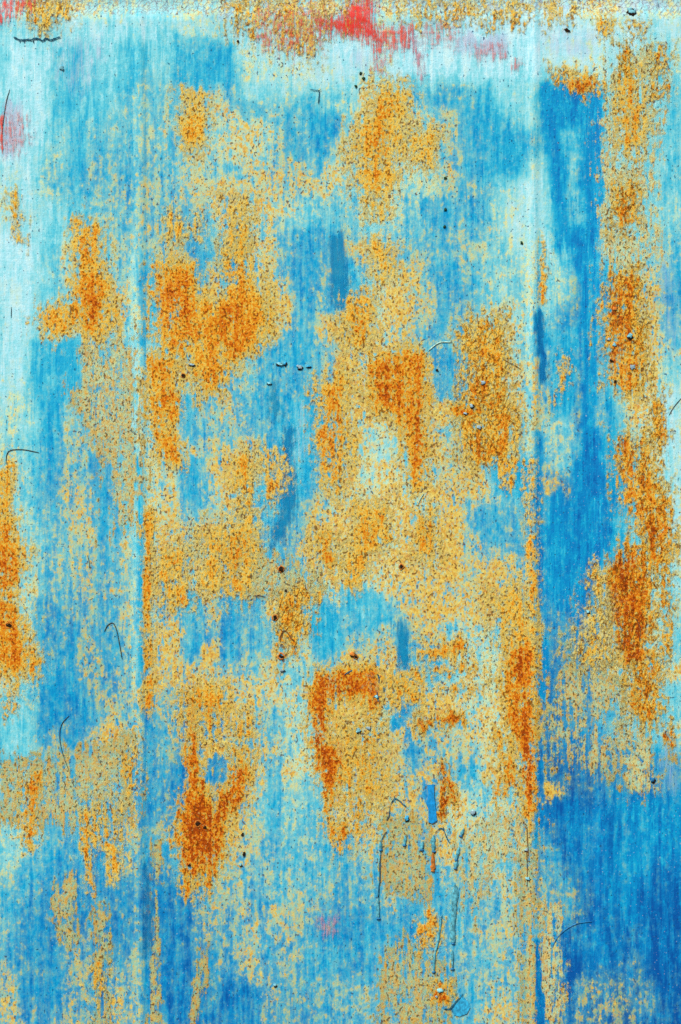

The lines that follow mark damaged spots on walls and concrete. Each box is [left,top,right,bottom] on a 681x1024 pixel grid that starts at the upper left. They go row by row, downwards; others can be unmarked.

rust [0,460,49,725]
rust [25,205,124,351]
rust [134,68,576,858]
rust [543,13,681,748]
rust [14,766,44,851]
rust [161,676,260,904]